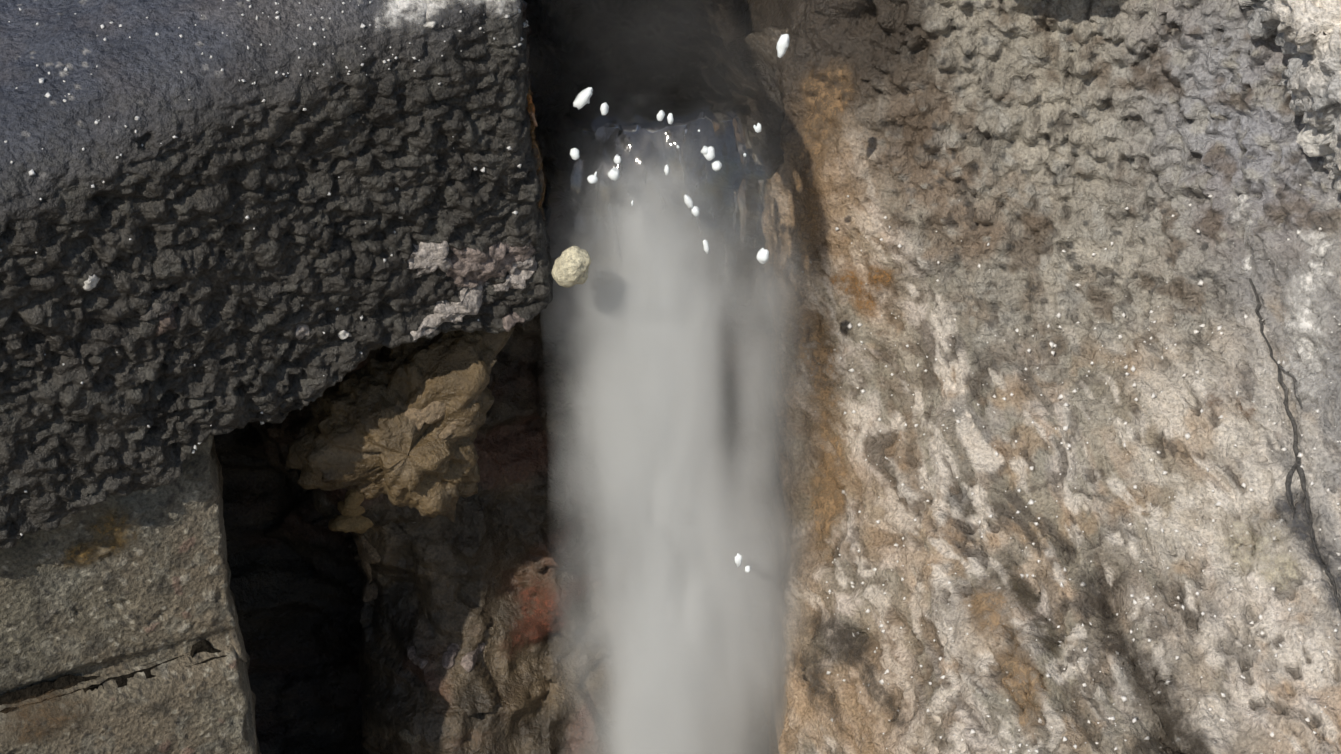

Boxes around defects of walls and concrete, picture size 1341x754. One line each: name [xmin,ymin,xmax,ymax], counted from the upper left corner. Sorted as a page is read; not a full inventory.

crack [0,640,227,713]